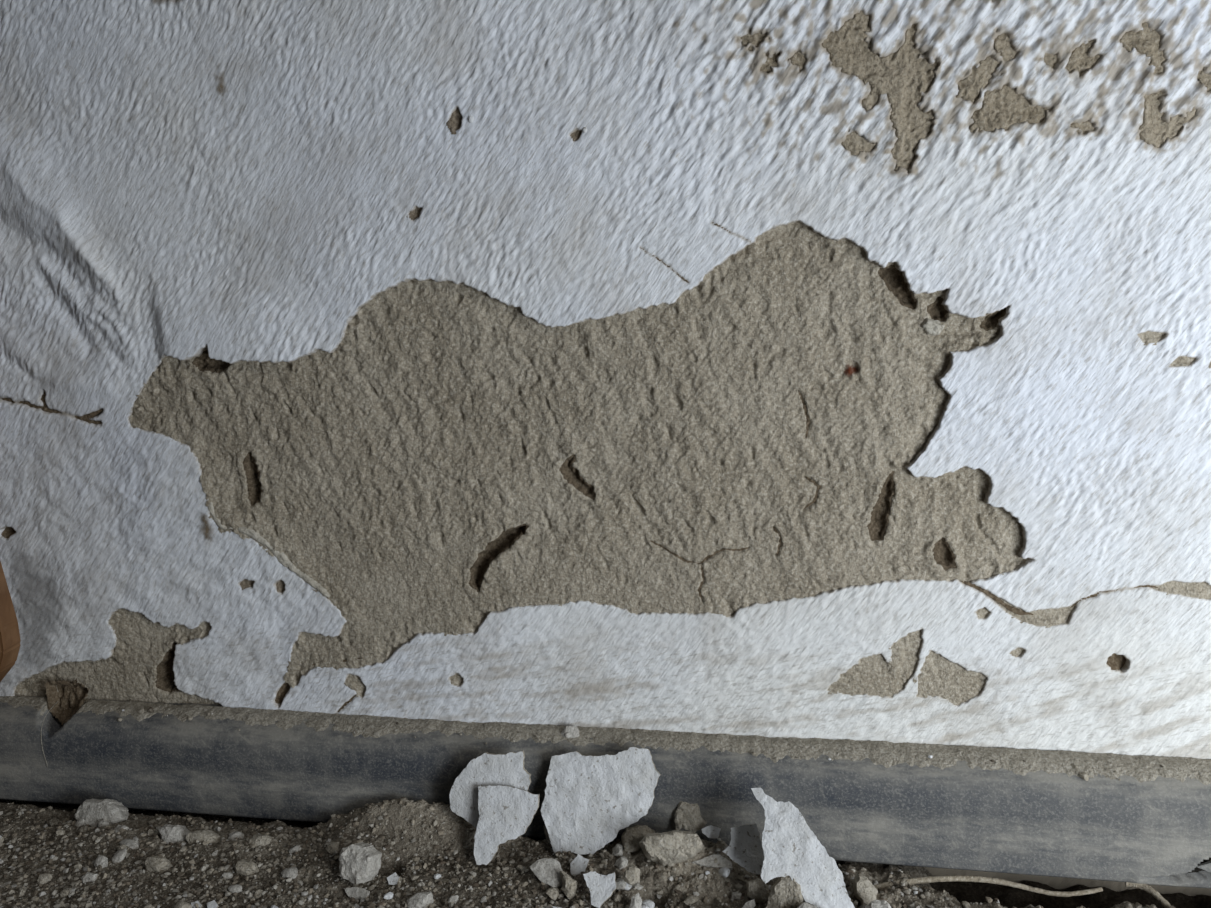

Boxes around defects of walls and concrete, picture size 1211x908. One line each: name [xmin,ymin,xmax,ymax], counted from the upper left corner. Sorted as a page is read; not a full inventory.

peeling [740,32,806,73]
peeling [822,11,938,173]
peeling [956,33,1049,133]
peeling [1040,40,1100,77]
peeling [1120,22,1165,74]
peeling [1139,91,1196,148]
peeling [1137,331,1165,345]
peeling [1170,356,1196,368]
crack [2,392,102,424]
spalling [128,222,1075,706]
peeling [1152,581,1211,599]
spalling [14,608,221,725]